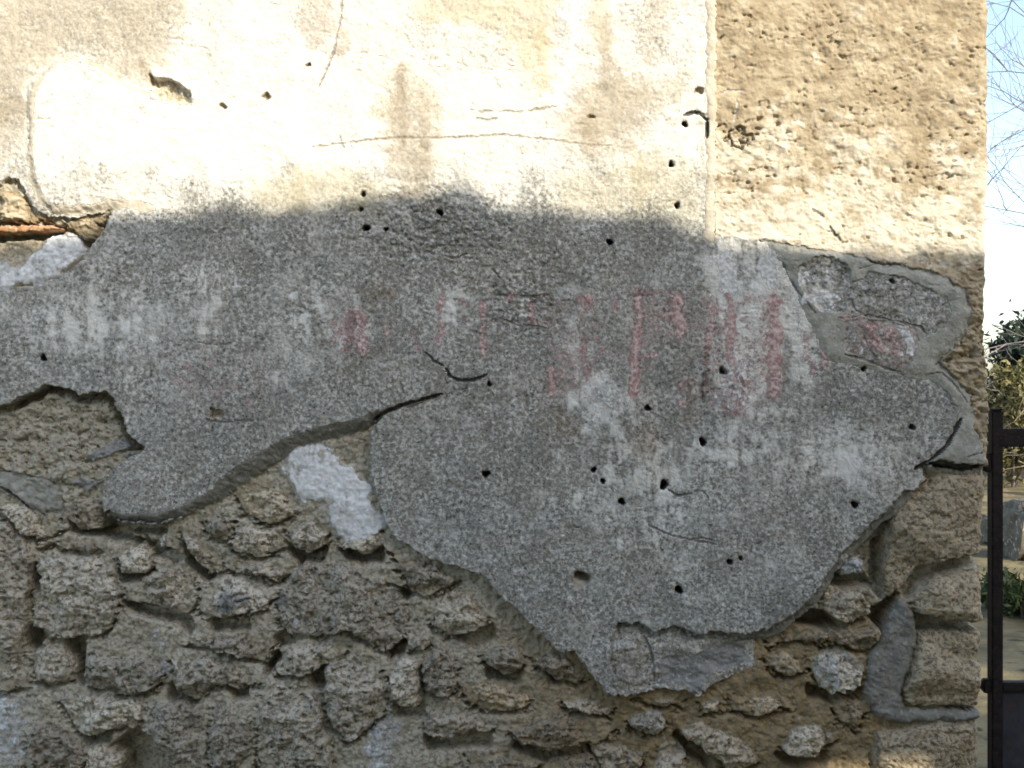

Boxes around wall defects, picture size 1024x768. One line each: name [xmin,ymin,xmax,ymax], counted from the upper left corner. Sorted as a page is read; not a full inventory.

crack [312,106,612,148]
spalling [0,385,145,491]
crack [373,352,488,421]
crack [914,358,984,471]
spalling [611,621,755,697]